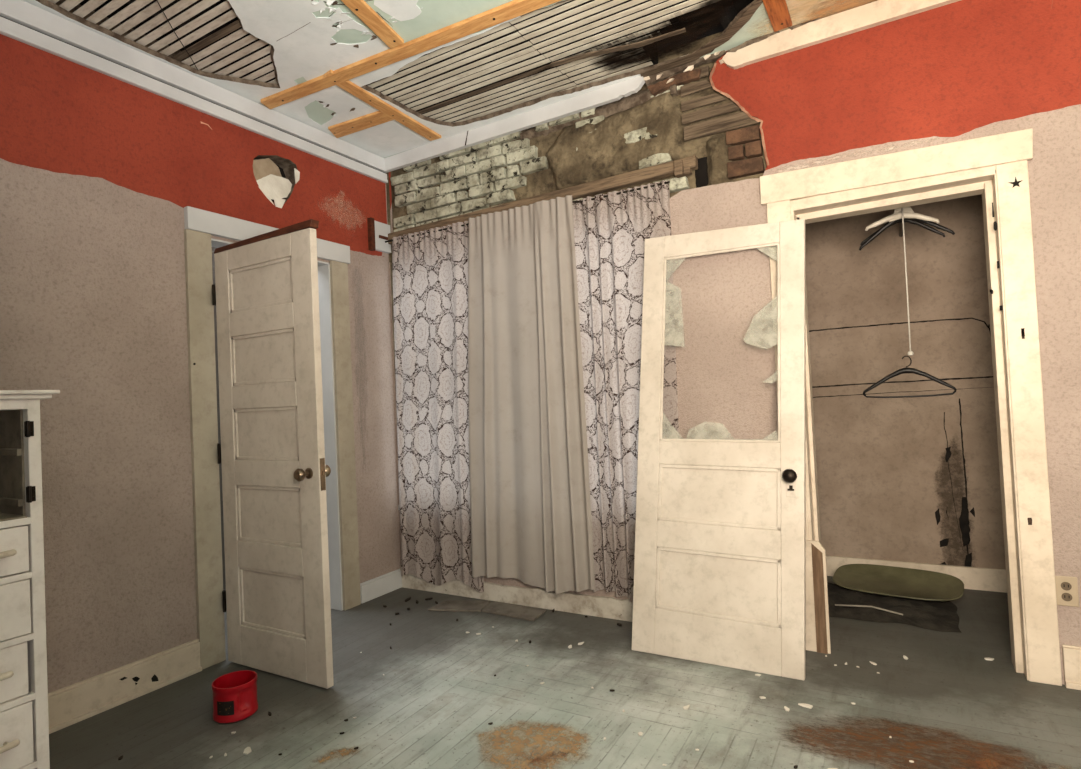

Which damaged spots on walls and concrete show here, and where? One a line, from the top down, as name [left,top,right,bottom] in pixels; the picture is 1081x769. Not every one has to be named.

leakage [766,0,878,34]
spalling [23,0,820,232]
leakage [936,442,973,566]